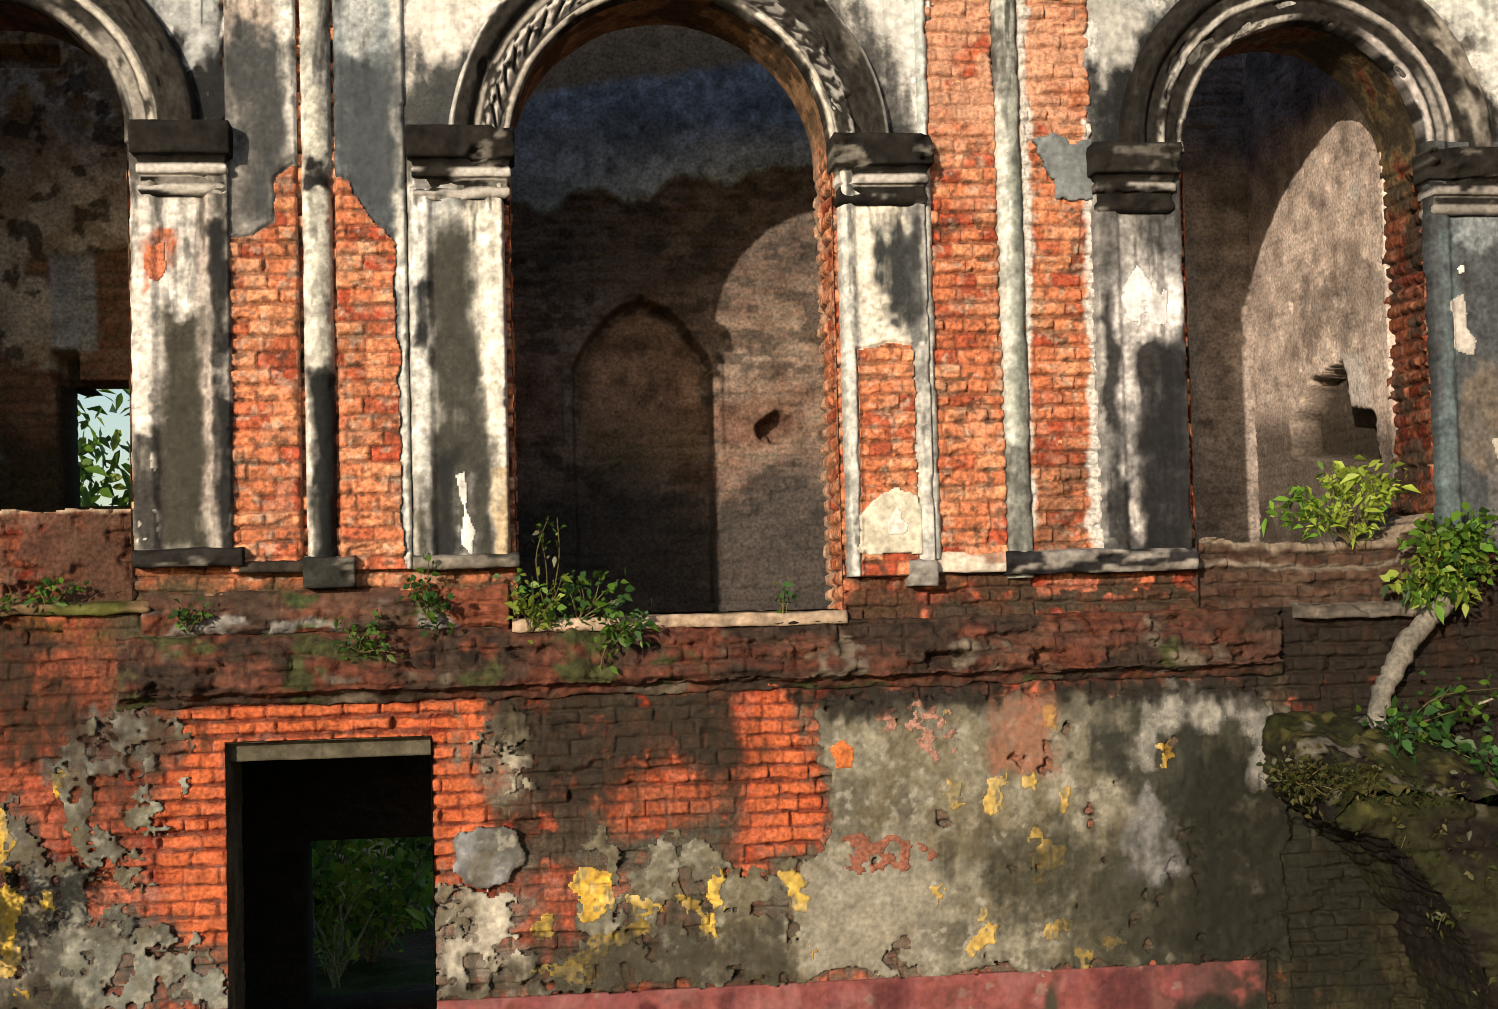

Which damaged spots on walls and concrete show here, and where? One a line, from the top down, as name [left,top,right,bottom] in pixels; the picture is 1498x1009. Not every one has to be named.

flaking render [1032,132,1093,201]
damp [158,222,233,548]
spalling [335,175,406,570]
damp [413,222,490,555]
spalling [857,343,924,576]
damp [1137,348,1193,549]
flaking render [0,706,229,1009]
flaking render [435,675,1299,1000]
damp [988,725,1395,1009]